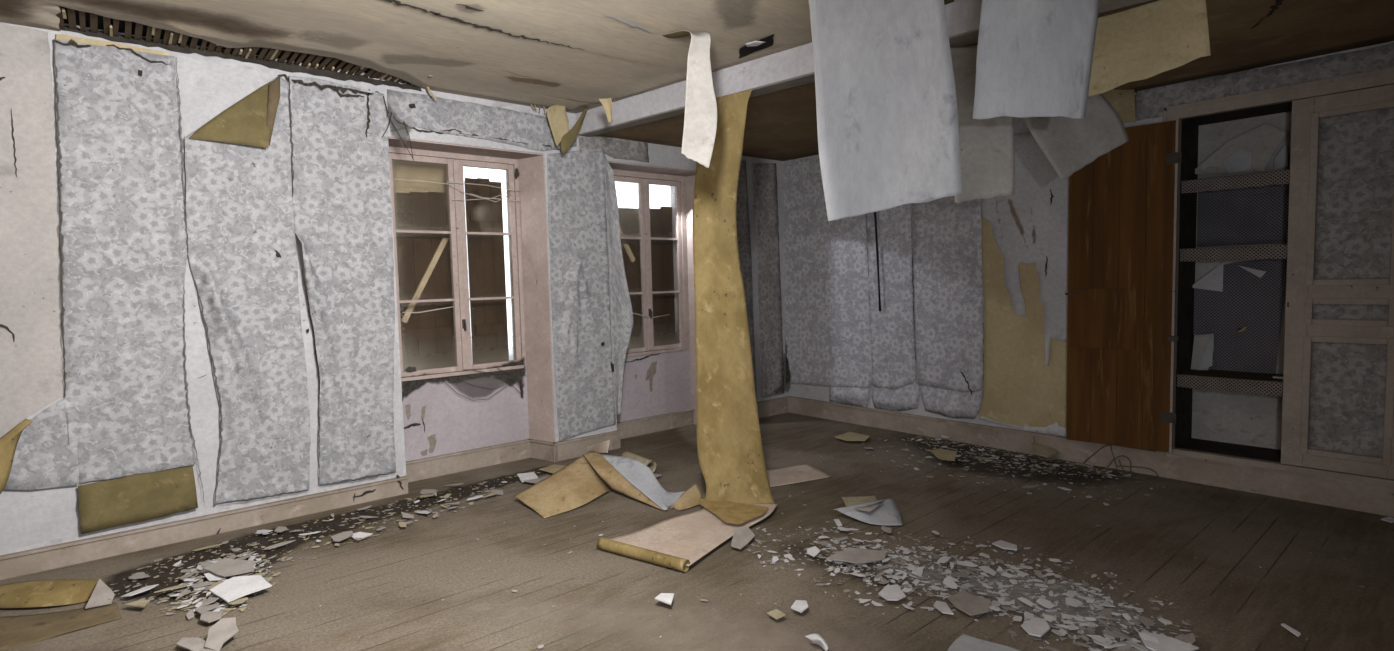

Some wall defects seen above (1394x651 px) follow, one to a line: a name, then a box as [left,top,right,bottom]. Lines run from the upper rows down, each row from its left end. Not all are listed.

crack [384,0,683,119]
crack [1251,0,1284,29]
crack [10,110,18,177]
peeling [0,6,422,552]
peeling [978,199,1067,427]
peeling [393,339,436,475]